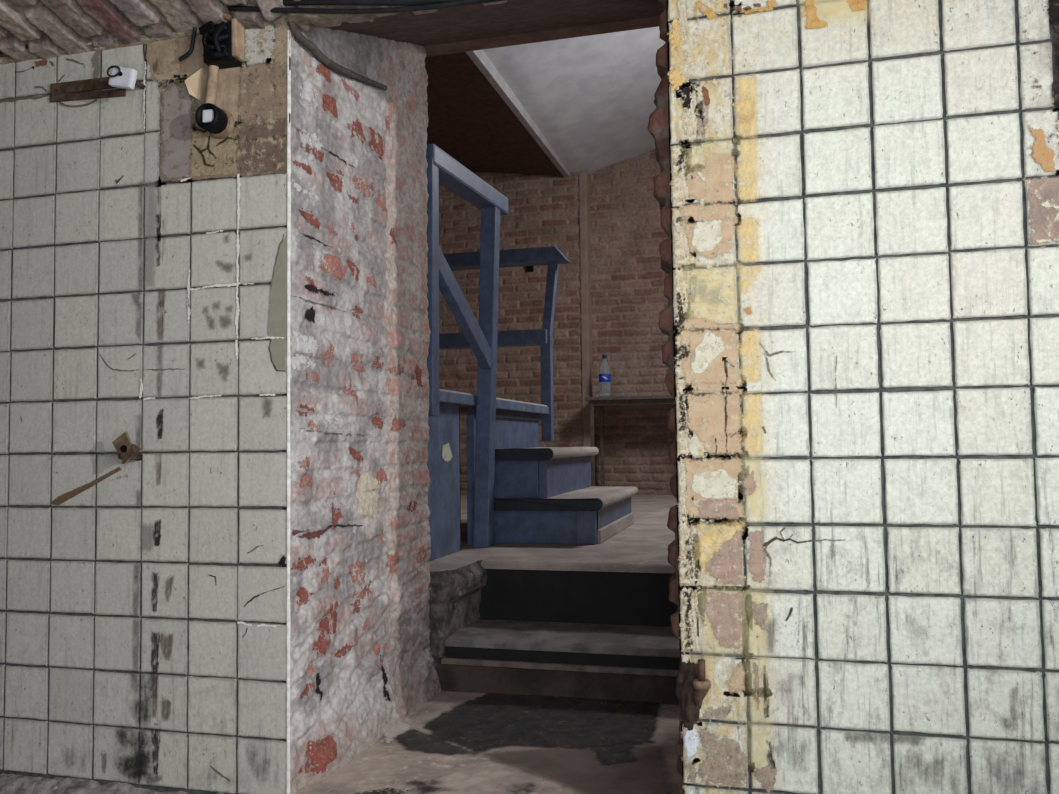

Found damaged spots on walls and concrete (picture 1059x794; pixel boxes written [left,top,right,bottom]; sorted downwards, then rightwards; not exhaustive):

peeling [805,0,828,29]
flaking render [146,23,392,211]
peeling [299,208,338,235]
peeling [305,253,376,287]
peeling [343,348,423,401]
peeling [371,412,406,431]
peeling [667,0,777,794]
peeling [348,447,363,478]
crack [763,528,841,577]
peeling [290,555,371,698]
leakage [103,648,160,779]
peeling [298,733,338,776]